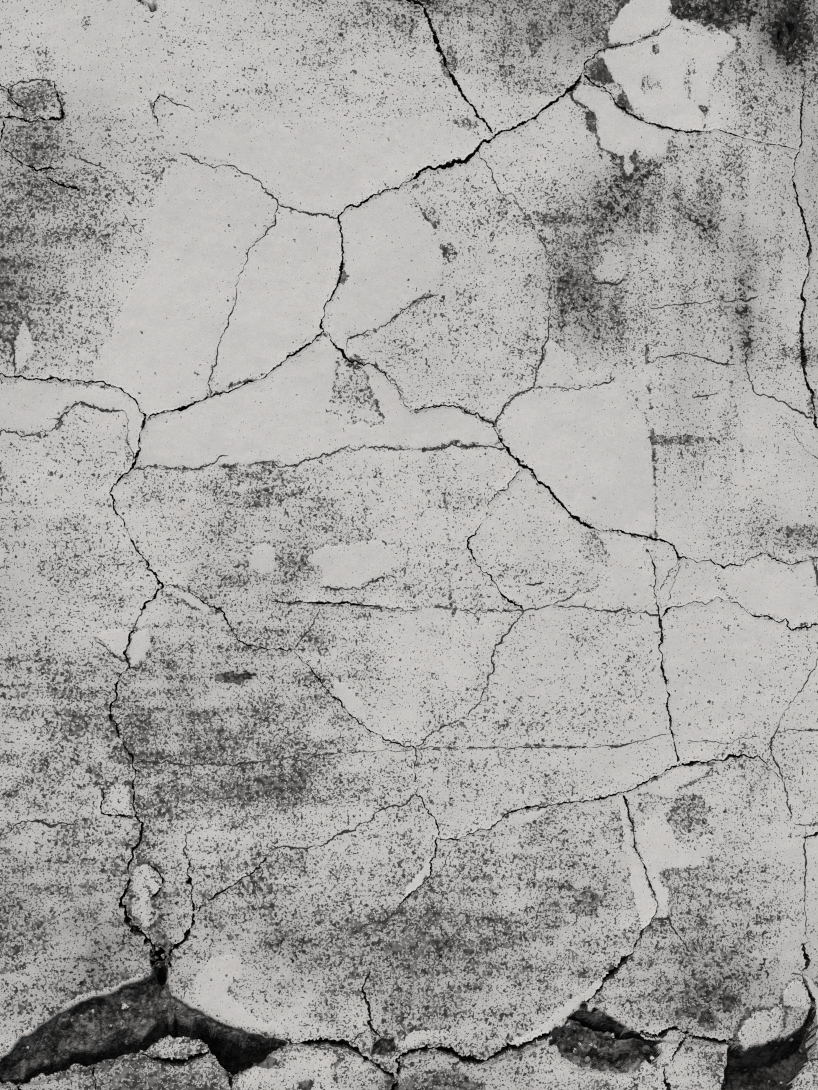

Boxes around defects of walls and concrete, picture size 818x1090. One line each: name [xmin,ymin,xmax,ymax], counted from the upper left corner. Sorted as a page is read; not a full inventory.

crack [0,78,105,192]
crack [146,0,818,717]
crack [0,336,818,1007]
crack [90,1067,99,1090]
spalling [0,955,343,1090]
crack [139,1049,235,1090]
crack [287,965,552,1090]
spalling [512,978,665,1073]
crack [640,1024,729,1090]
spalling [721,976,818,1090]